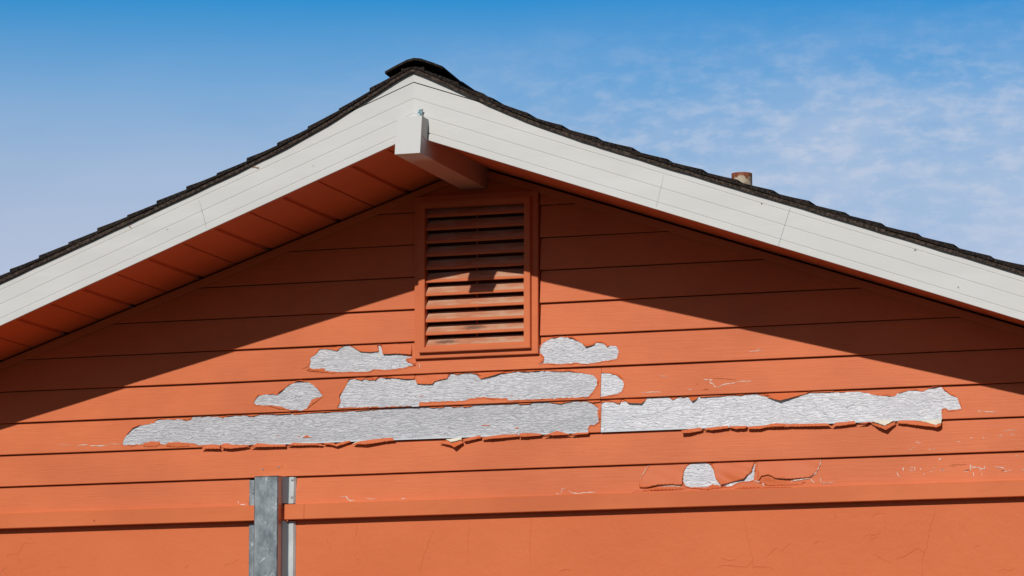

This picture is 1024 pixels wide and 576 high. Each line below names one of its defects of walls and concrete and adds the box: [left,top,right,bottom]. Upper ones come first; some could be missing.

peeling [69,335,962,449]
peeling [639,461,757,491]